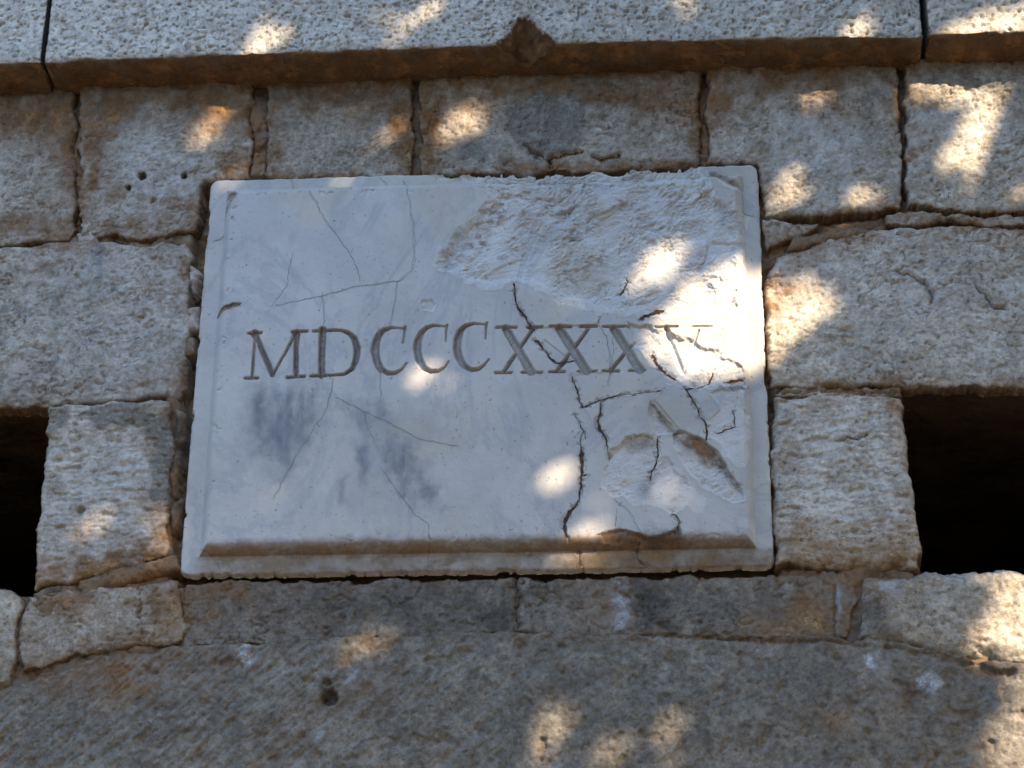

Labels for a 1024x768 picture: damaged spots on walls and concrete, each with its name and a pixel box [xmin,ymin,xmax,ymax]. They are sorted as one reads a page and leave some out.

crack [272,177,457,568]
spalling [432,166,752,551]
crack [513,283,744,570]